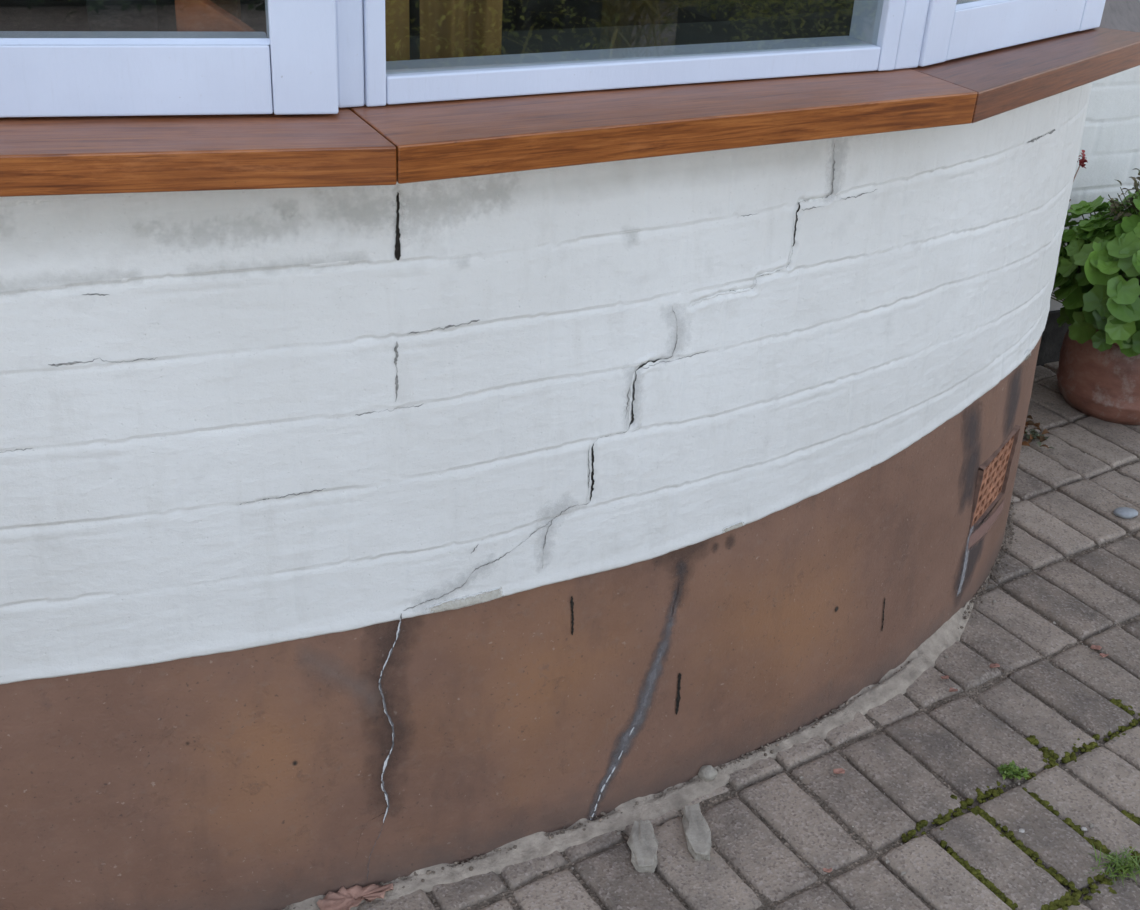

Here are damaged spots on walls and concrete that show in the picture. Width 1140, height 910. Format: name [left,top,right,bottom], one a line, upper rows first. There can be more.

crack [356,144,876,880]